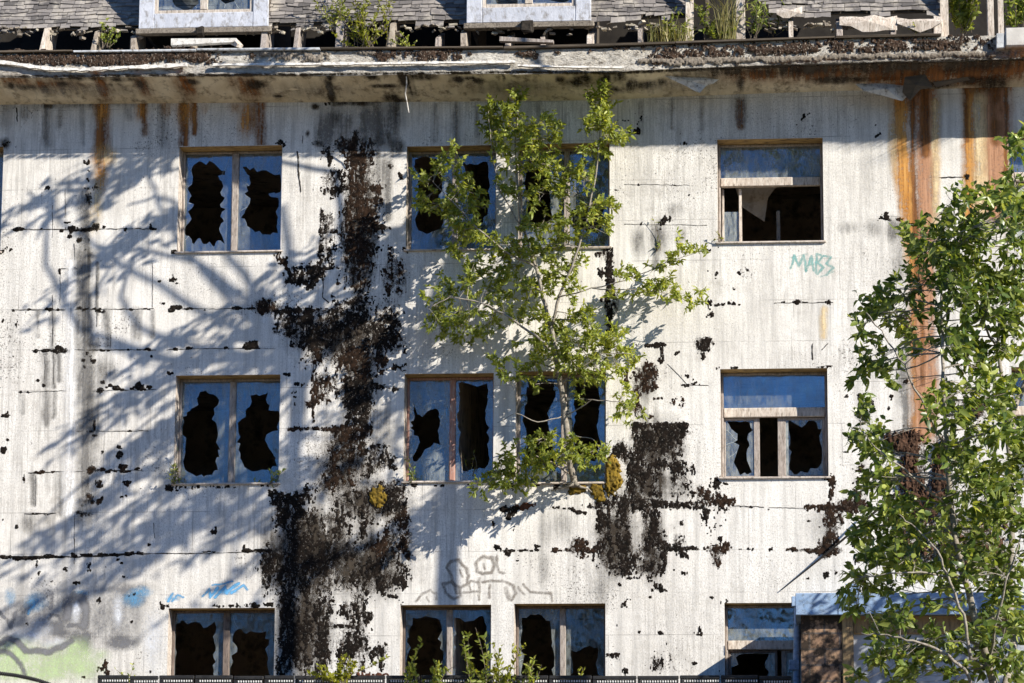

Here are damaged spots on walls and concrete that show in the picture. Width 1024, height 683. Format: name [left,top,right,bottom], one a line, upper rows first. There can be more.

corrosion [95,104,113,210]
corrosion [179,103,197,146]
water stain [0,50,1024,294]
corrosion [963,87,1012,221]
corrosion [891,89,940,442]
water stain [635,423,675,499]
water stain [264,508,401,676]
water stain [603,516,631,567]